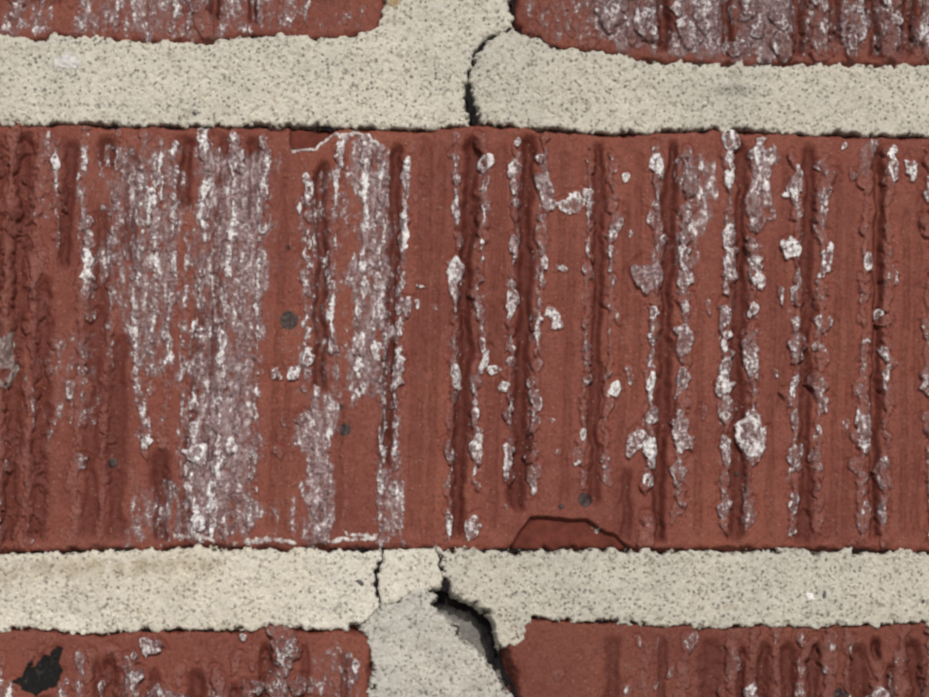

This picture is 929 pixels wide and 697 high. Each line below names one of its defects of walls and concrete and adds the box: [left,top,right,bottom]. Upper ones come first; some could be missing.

damp [575,0,800,66]
damp [805,0,929,56]
crack [93,0,642,135]
crack [665,128,765,136]
damp [77,128,425,549]
damp [626,129,804,515]
damp [450,277,516,487]
crack [306,548,386,603]
crack [720,546,777,554]
crack [808,547,922,555]
crack [428,548,695,697]
damp [0,646,84,697]